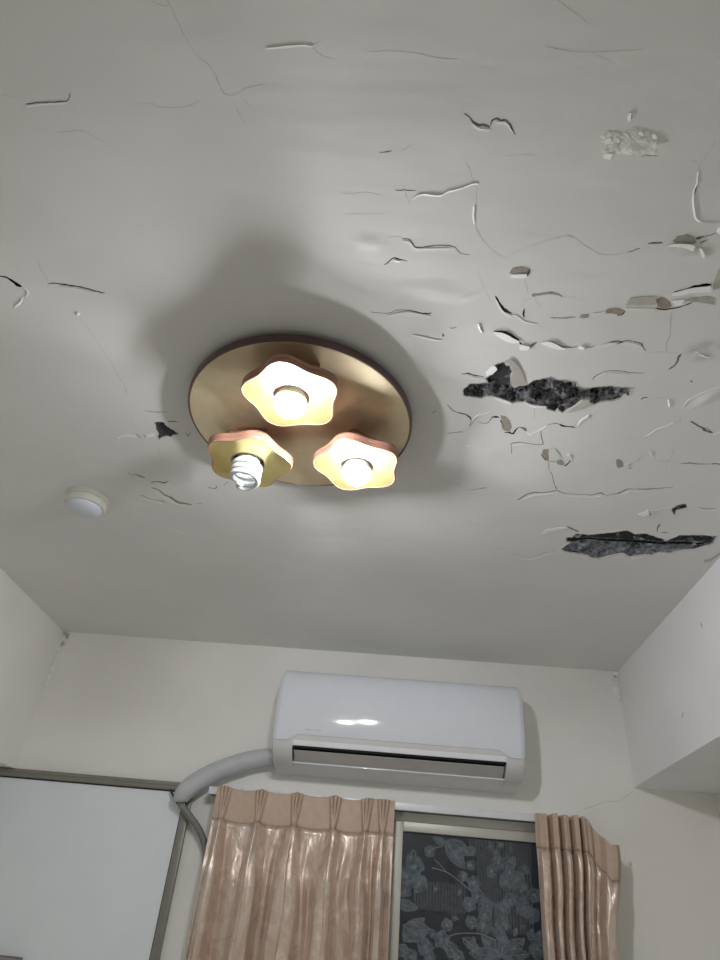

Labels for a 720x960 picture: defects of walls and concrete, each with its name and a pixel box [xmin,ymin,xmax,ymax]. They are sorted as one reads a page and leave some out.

crack [464,113,531,156]
peeling [600,112,670,160]
crack [343,163,626,265]
crack [479,276,536,326]
peeling [550,269,720,319]
crack [0,260,127,396]
crack [464,373,484,382]
spalling [462,359,635,414]
spalling [117,421,191,441]
crack [510,410,589,453]
crack [691,421,720,436]
spalling [543,526,720,563]